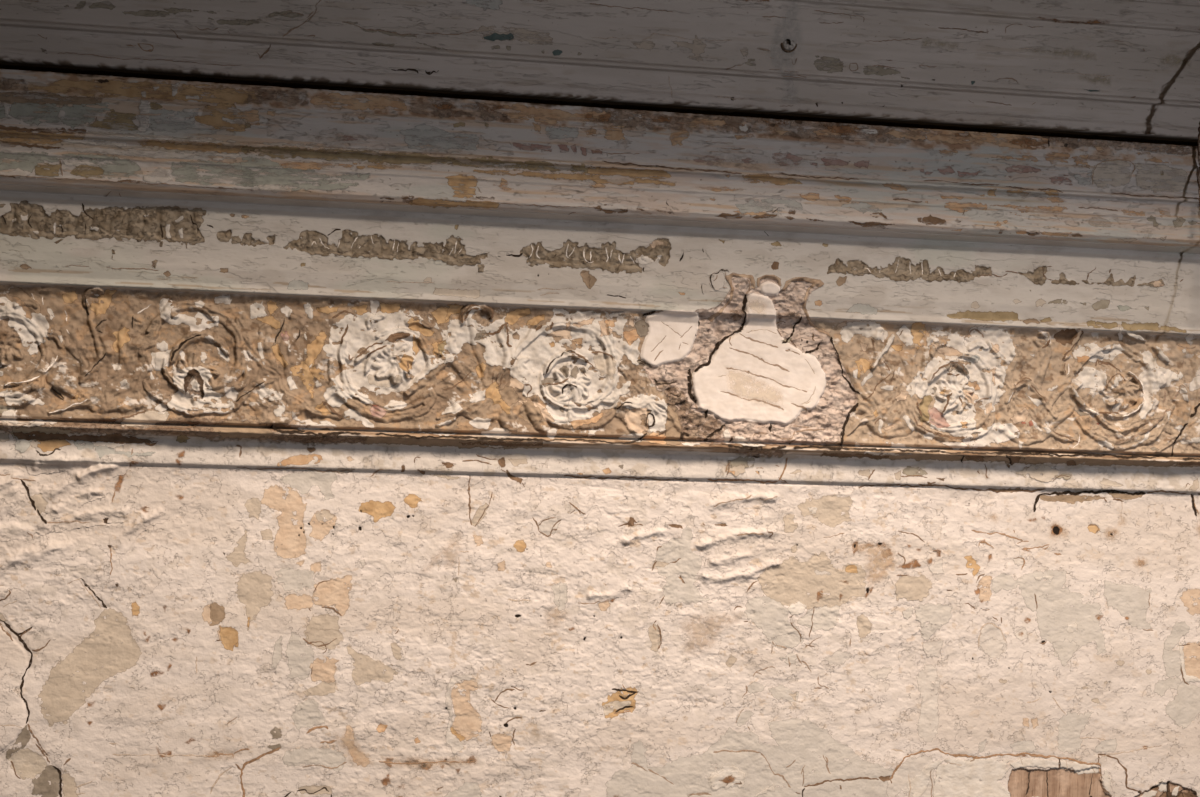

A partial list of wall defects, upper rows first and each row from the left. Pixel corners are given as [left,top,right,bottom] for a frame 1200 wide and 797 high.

peeling [506,238,684,296]
peeling [827,257,992,286]
crack [680,279,1200,570]
peeling [783,266,1200,533]
crack [620,517,726,528]
crack [68,578,107,608]
peeling [734,551,866,653]
crack [0,601,51,755]
spalling [6,725,78,797]
crack [632,762,711,796]
peeling [605,687,1117,797]
crack [714,634,1161,797]